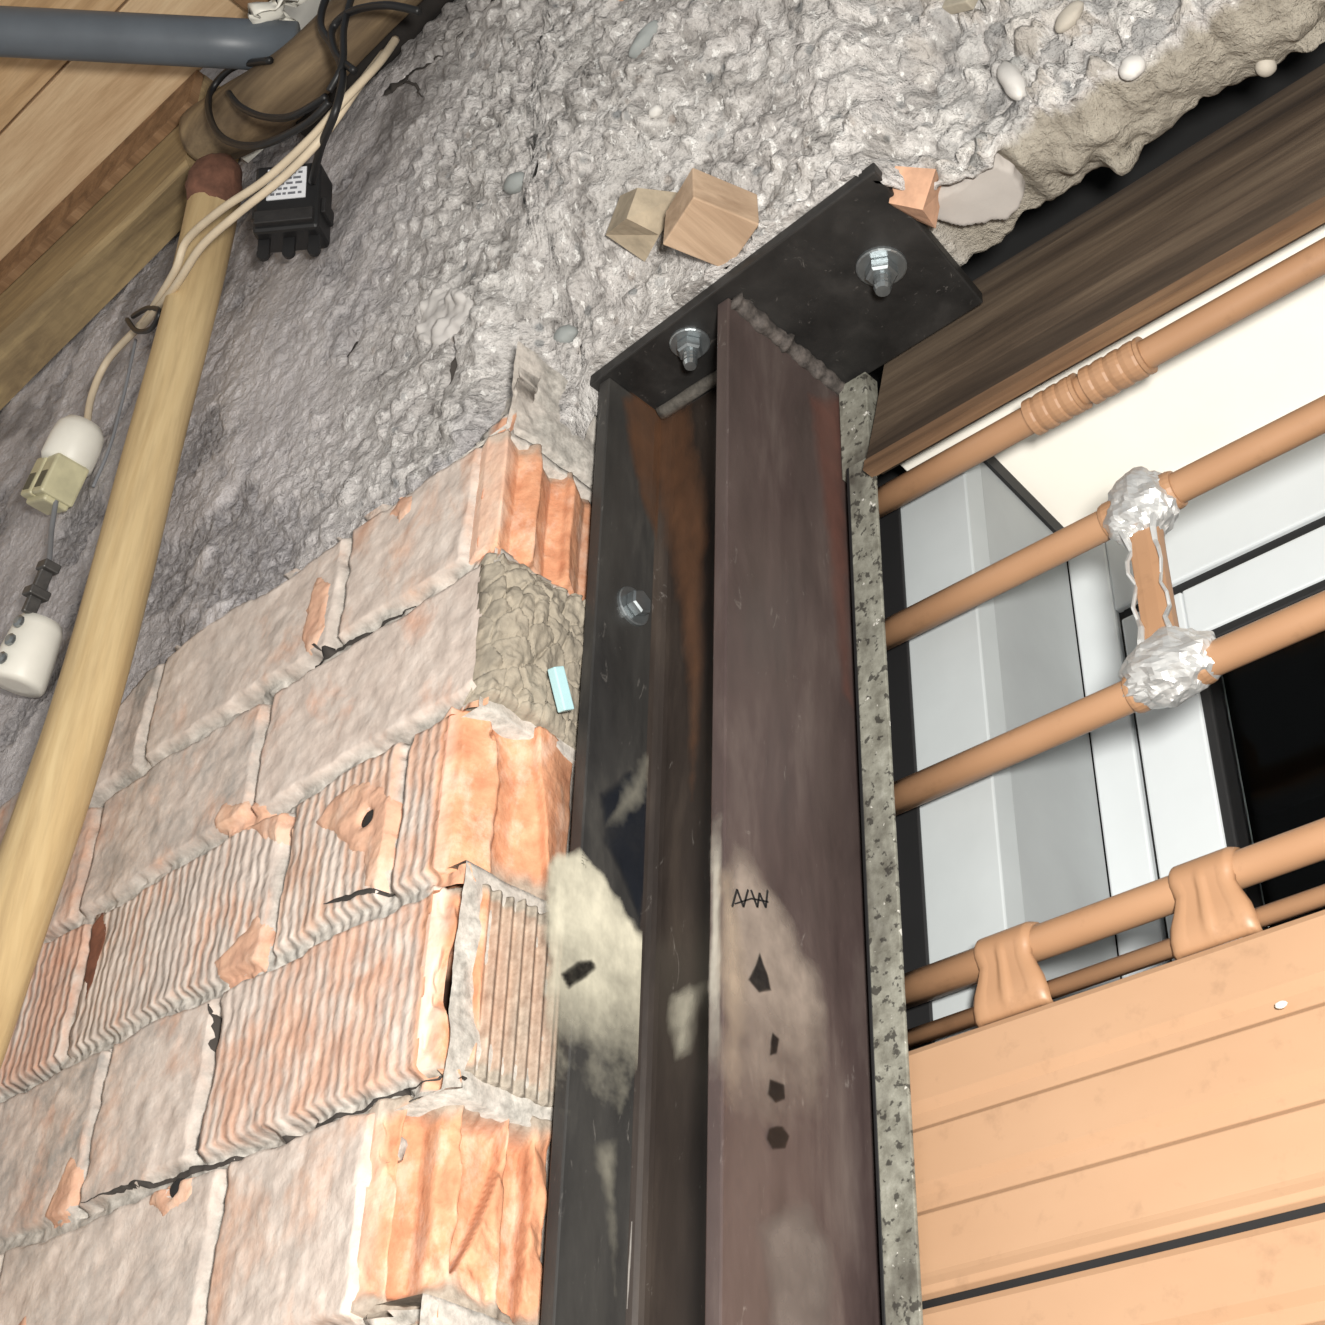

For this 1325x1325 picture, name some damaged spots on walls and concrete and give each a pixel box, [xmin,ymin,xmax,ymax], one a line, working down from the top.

spalling [961,42,1325,281]
spalling [869,364,884,396]
spalling [877,465,906,487]
crack [312,606,416,668]
crack [323,888,396,904]
crack [208,1004,222,1053]
crack [276,1075,467,1148]
crack [81,1132,244,1203]